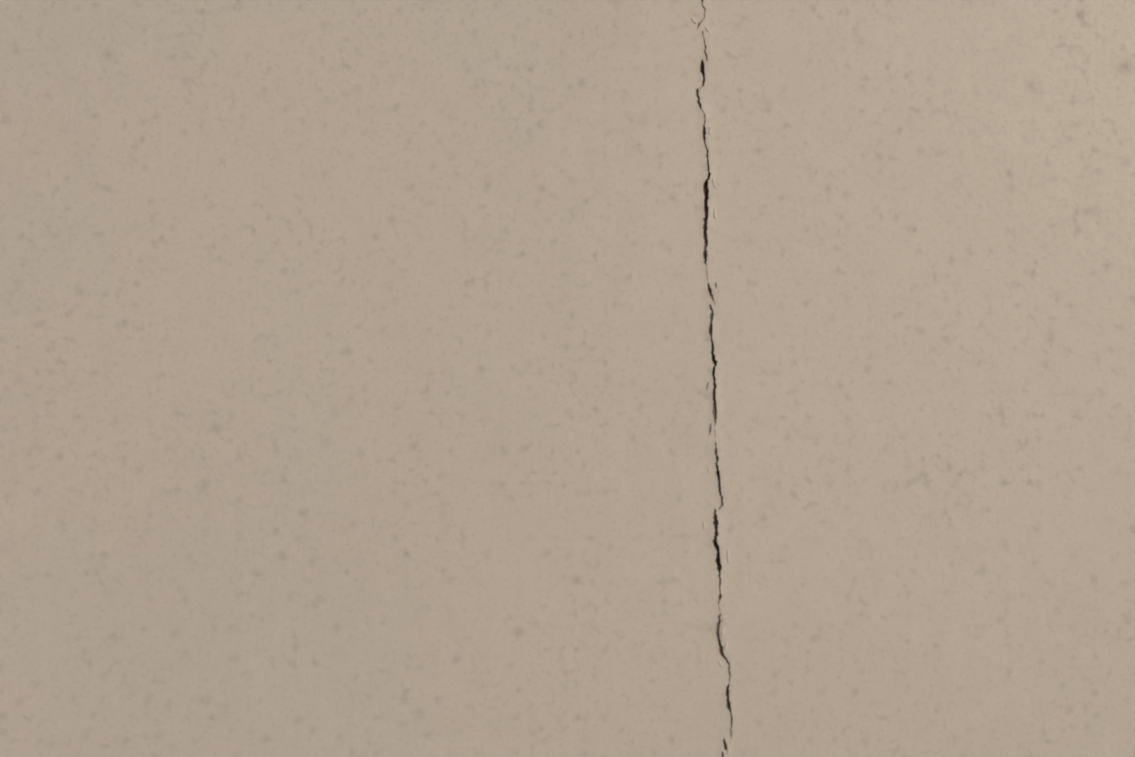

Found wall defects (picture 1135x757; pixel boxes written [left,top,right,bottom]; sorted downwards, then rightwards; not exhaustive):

crack [691,0,733,757]